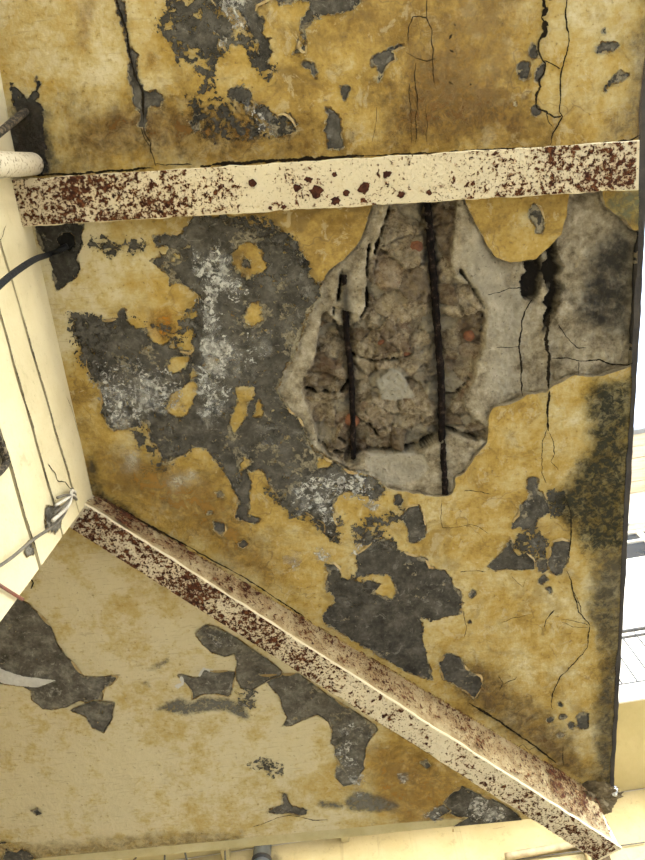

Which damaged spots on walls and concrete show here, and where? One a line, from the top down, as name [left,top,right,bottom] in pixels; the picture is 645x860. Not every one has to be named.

corrosion [12,166,257,226]
peeling [154,0,361,145]
crack [35,0,570,176]
corrosion [264,155,417,210]
corrosion [424,141,637,201]
spalling [34,191,637,699]
crack [488,287,532,396]
crack [541,315,633,482]
peeling [0,599,120,733]
peeling [158,624,398,812]
corrosion [73,496,620,860]
crack [544,501,590,707]